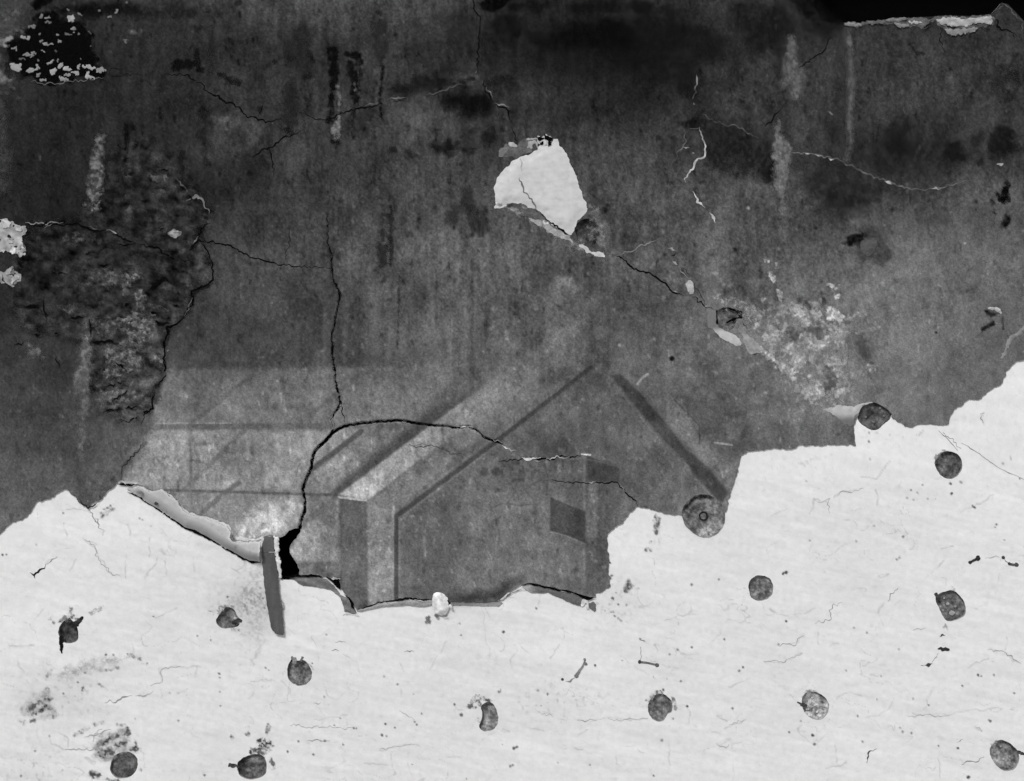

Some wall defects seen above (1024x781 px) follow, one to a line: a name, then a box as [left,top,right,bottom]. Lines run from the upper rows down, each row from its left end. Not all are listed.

peeling [5,9,106,86]
water stain [84,135,105,211]
crack [105,0,571,236]
peeling [499,134,552,157]
crack [617,239,747,328]
water stain [74,321,92,457]
crack [26,214,638,529]
flaking render [118,480,264,563]
flaking render [284,574,596,623]
flaking render [27,693,55,723]
flaking render [65,723,138,760]
peeling [245,723,275,766]